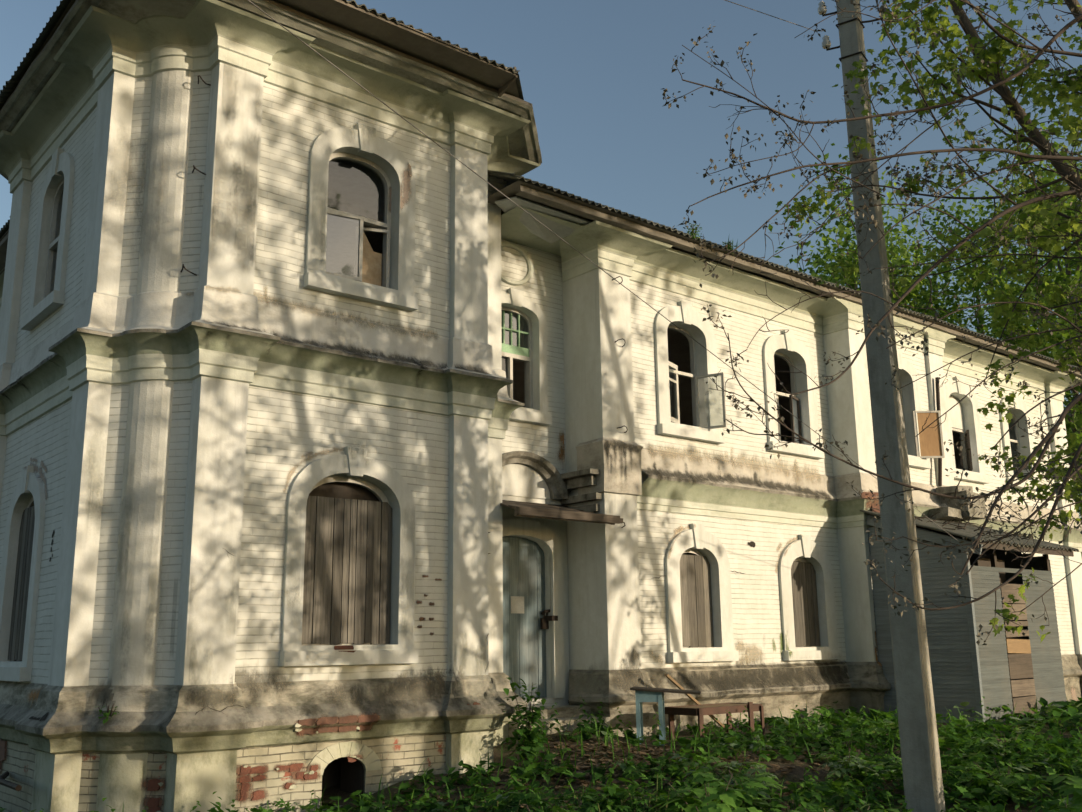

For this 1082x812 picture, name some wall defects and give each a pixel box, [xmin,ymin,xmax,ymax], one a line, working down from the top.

peeling [389,164,412,211]
water stain [604,440,639,477]
water stain [642,464,830,499]
water stain [89,684,114,703]
water stain [189,671,288,706]
water stain [331,672,457,707]
flaking render [294,715,376,735]
flaking render [142,778,165,812]
flaking render [236,763,320,802]